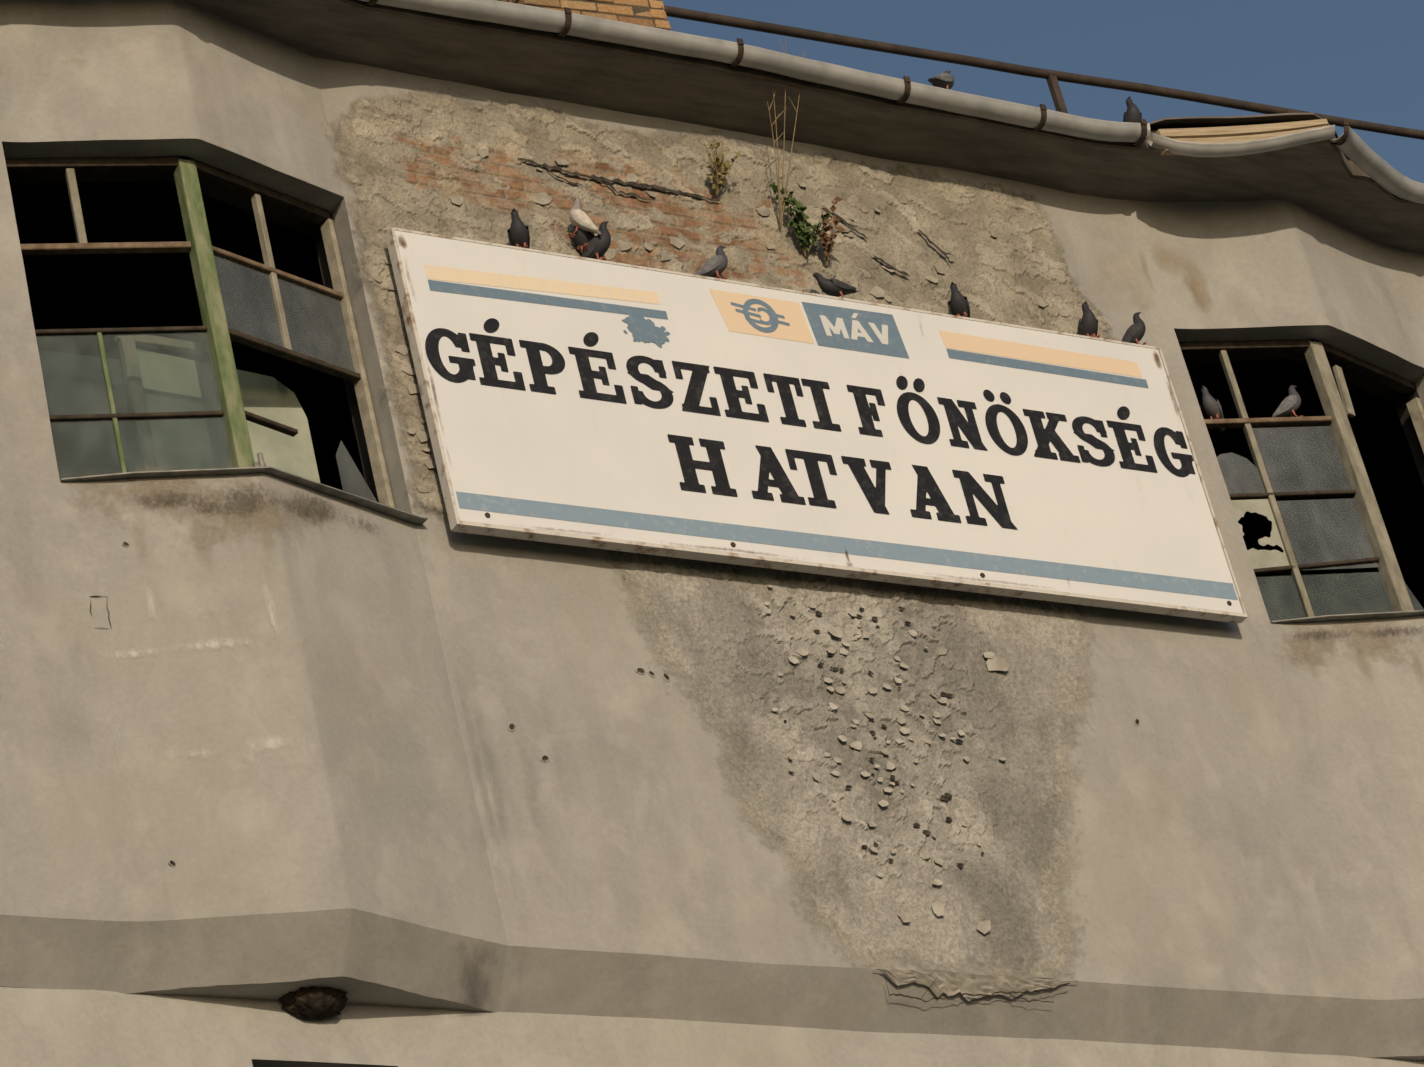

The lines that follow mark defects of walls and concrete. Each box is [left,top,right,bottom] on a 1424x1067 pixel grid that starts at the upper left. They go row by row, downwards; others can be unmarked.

flaking render [333,92,1117,519]
flaking render [612,550,1092,1001]
crack [885,978,1070,1003]